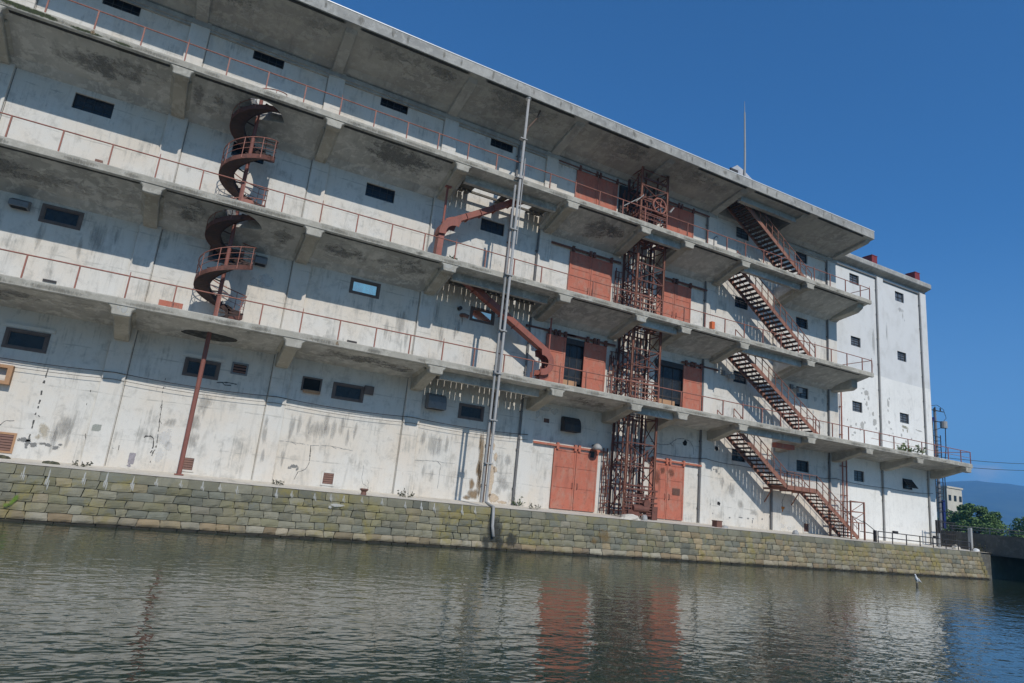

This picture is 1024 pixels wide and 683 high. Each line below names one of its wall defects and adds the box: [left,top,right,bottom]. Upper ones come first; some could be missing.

crack [0,368,49,436]
crack [144,378,166,463]